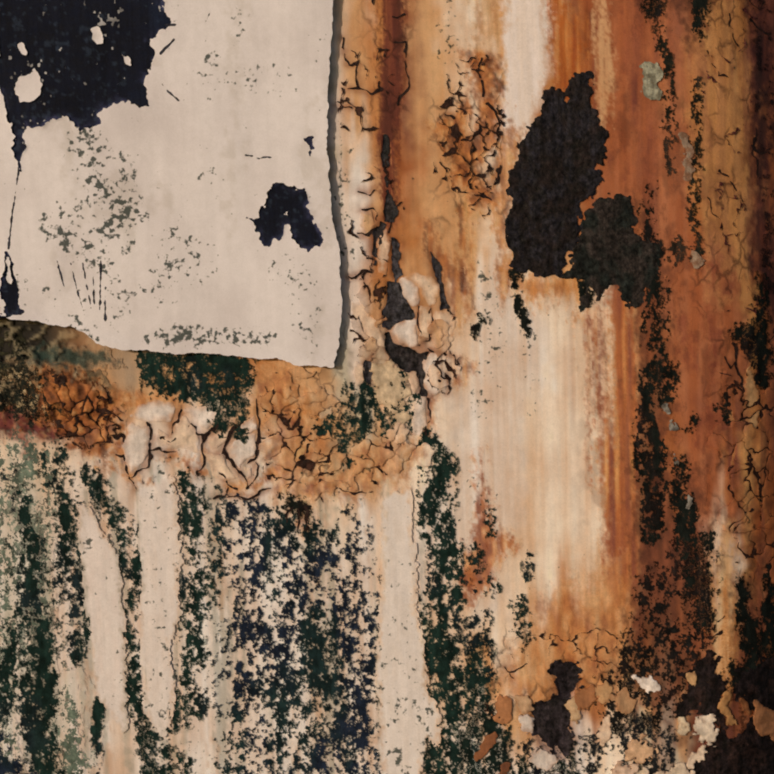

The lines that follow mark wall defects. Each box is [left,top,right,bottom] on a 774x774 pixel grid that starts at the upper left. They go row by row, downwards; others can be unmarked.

peeling [0,0,171,172]
peeling [246,182,323,252]
crack [433,54,506,219]
damp [639,0,679,176]
damp [727,0,774,390]
rust [0,362,187,490]
crack [42,306,461,531]
rust [222,360,443,545]
damp [0,178,774,774]
rust [414,0,774,739]
crack [707,342,774,584]
peeling [474,659,637,771]